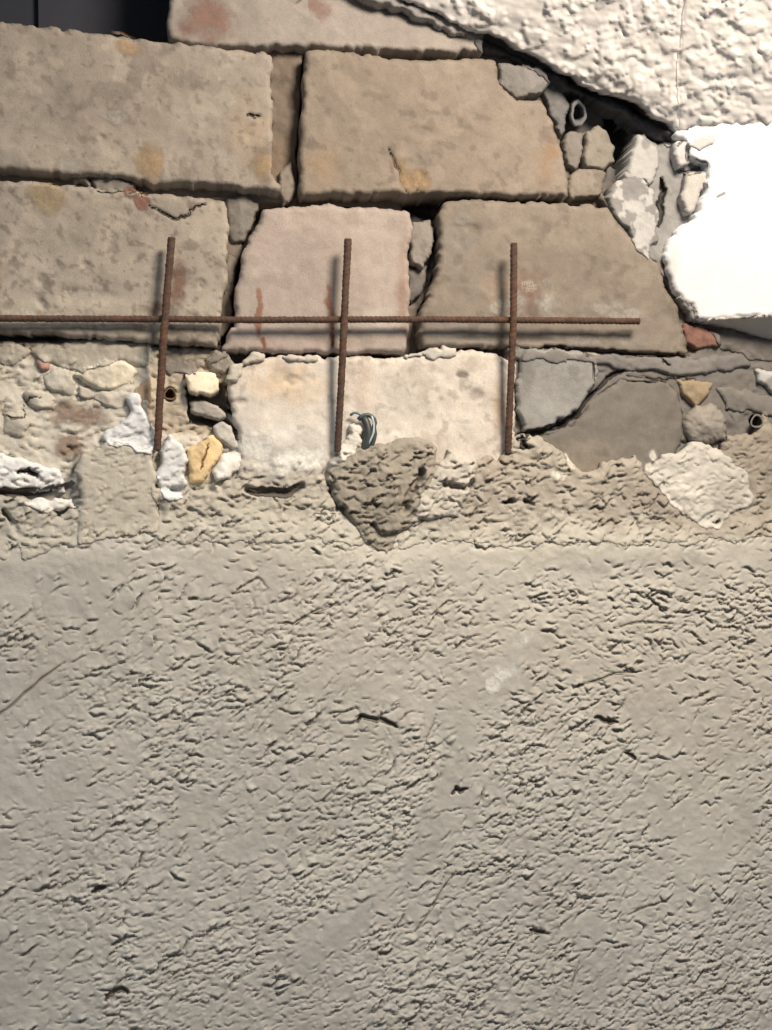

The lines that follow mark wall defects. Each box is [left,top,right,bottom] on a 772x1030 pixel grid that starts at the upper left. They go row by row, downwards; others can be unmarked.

crack [134,188,206,221]
peeling [669,134,716,217]
rust [255,289,266,348]
spalling [0,237,641,454]
rust [325,286,335,347]
peeling [673,295,699,324]